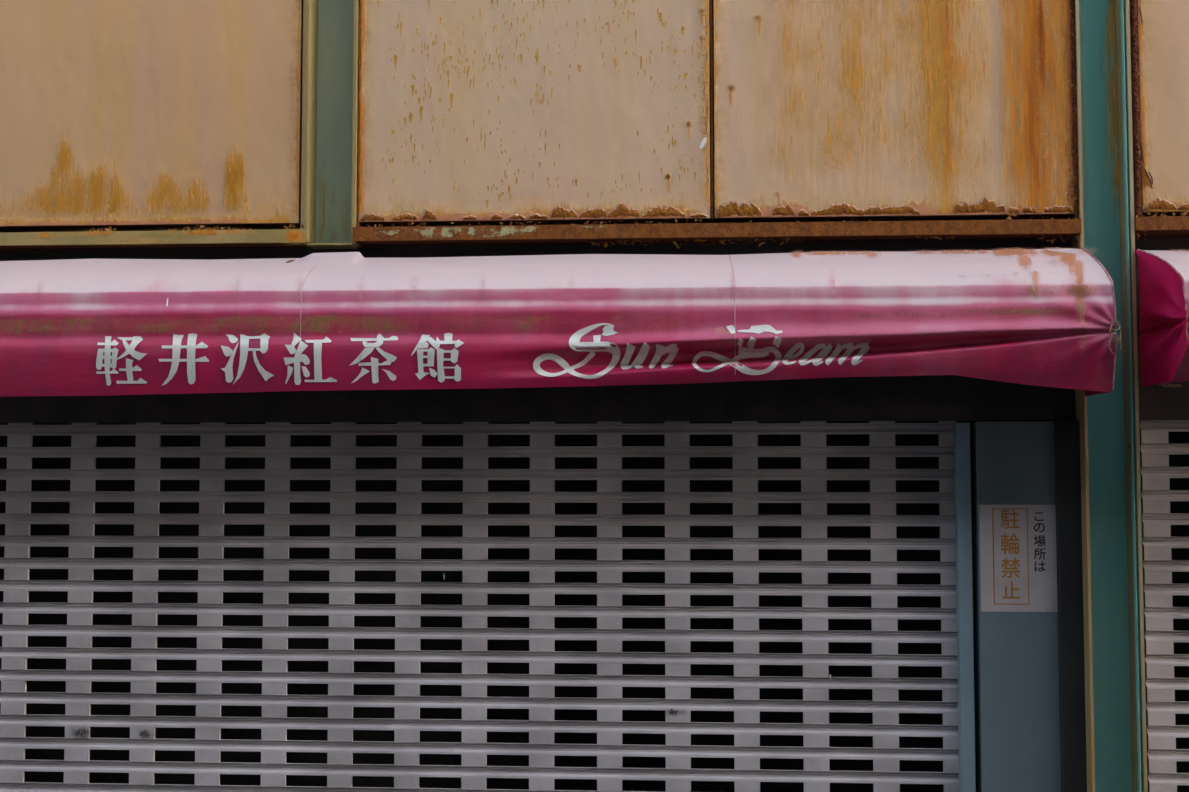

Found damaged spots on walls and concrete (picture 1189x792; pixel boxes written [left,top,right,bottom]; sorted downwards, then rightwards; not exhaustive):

corrosion [0,140,304,243]
corrosion [359,0,1079,222]
corrosion [1106,0,1119,191]
corrosion [1130,0,1189,215]